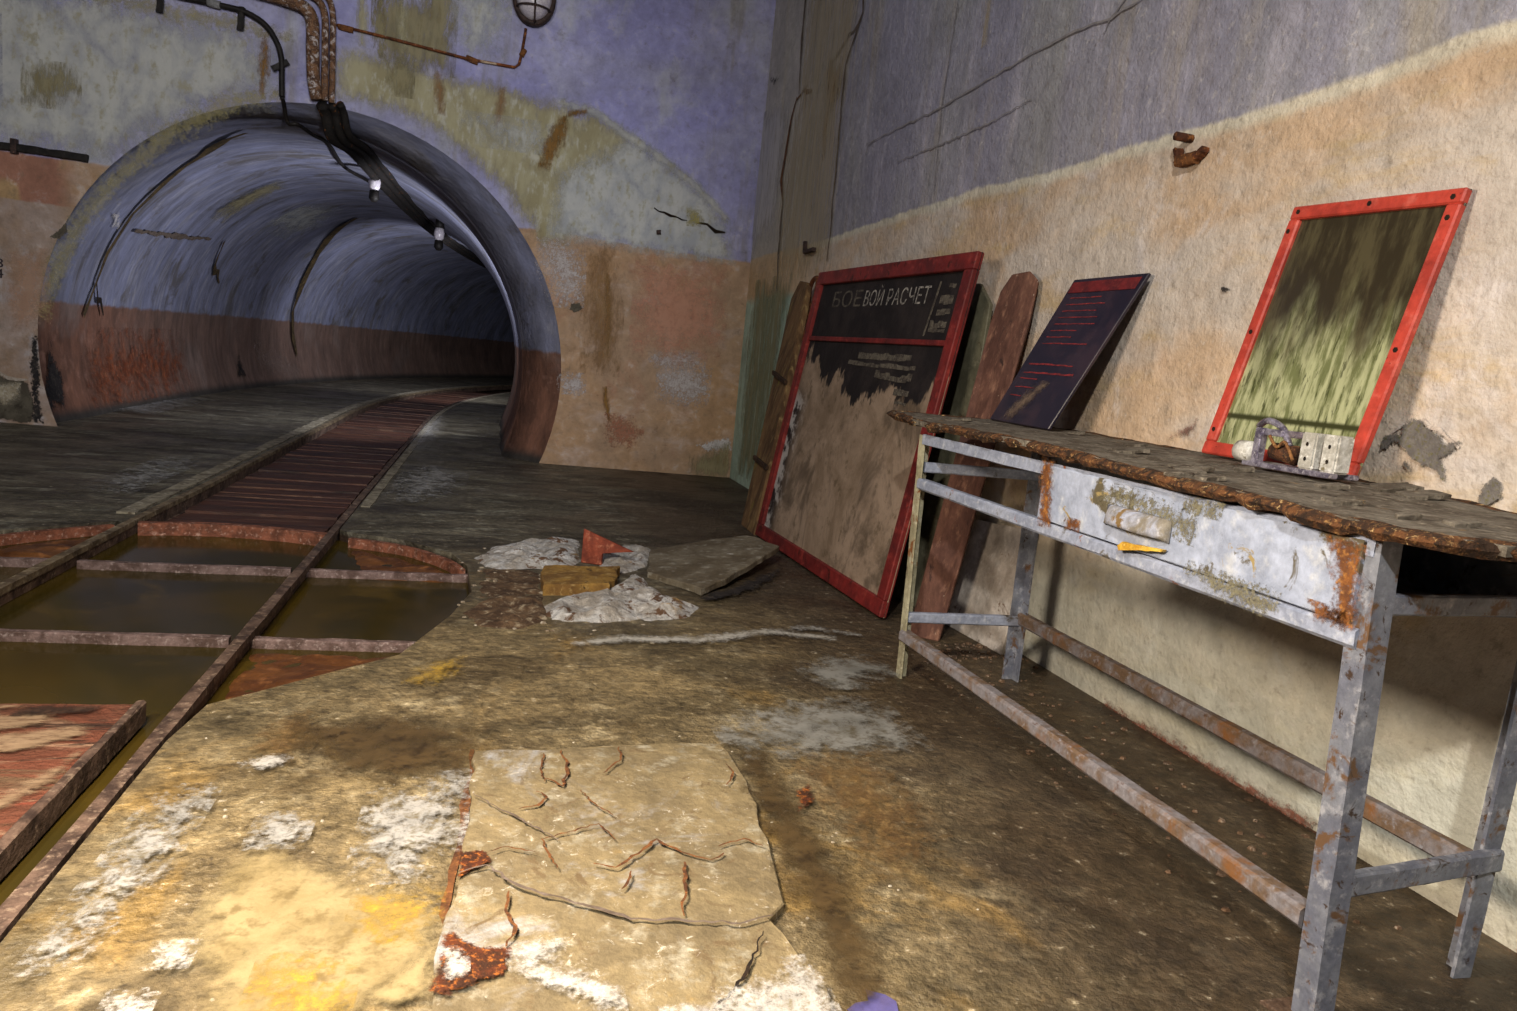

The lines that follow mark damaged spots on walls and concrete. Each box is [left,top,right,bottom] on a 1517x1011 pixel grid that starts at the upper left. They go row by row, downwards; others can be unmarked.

crack [654,207,725,234]
crack [776,0,1140,291]
peeling [1314,418,1460,520]
crack [429,747,773,1010]